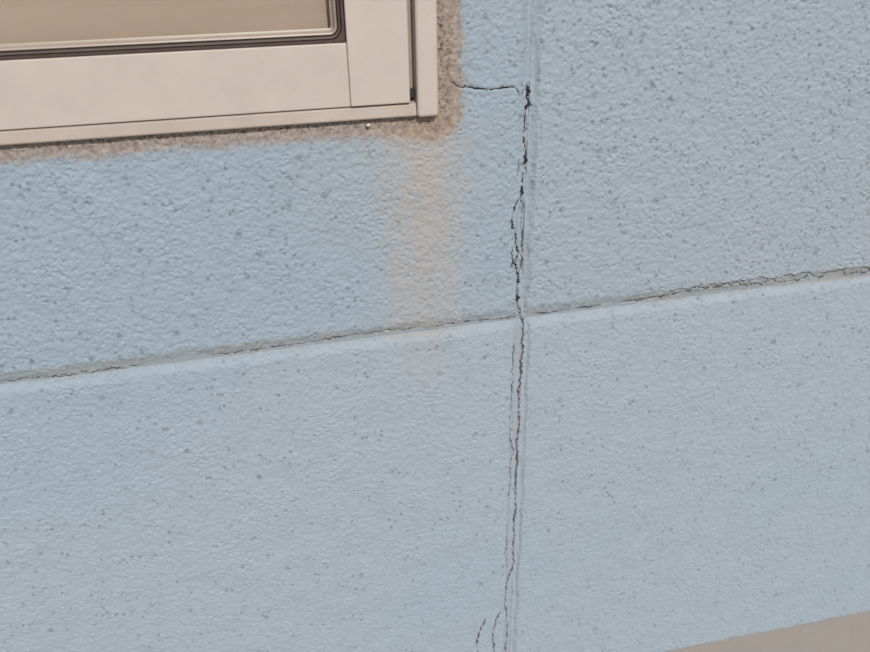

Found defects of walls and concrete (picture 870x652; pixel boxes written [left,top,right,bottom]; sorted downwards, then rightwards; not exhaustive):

crack [622,266,870,302]
crack [211,327,414,355]
crack [435,81,597,652]